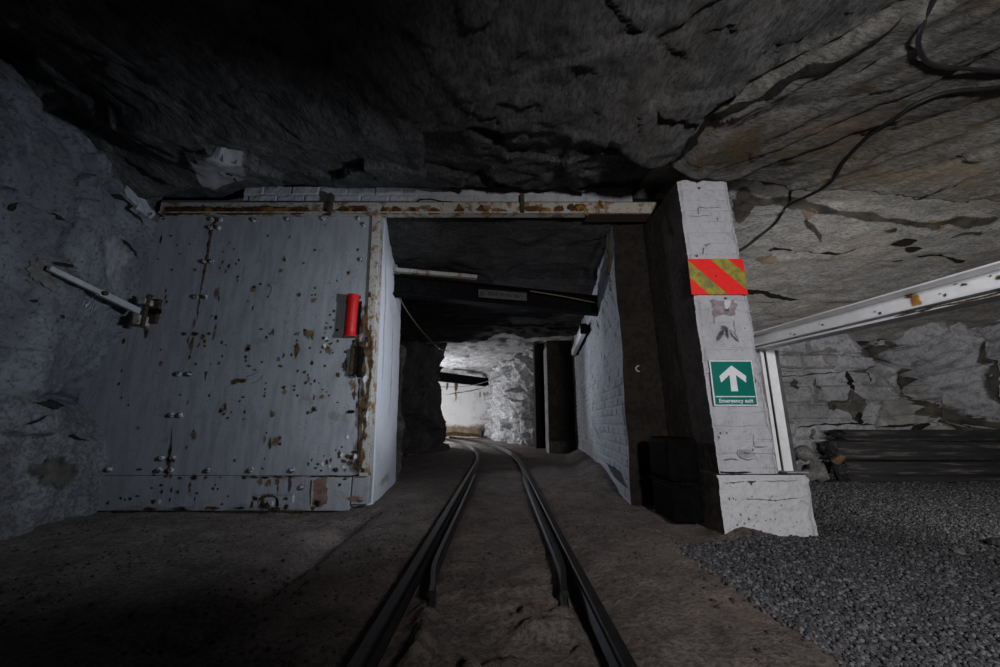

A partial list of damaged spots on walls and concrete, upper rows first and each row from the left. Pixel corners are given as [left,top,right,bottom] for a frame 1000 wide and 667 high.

rust [454,204,507,215]
rust [525,200,603,215]
rust [896,291,1000,317]
rust [106,310,362,514]